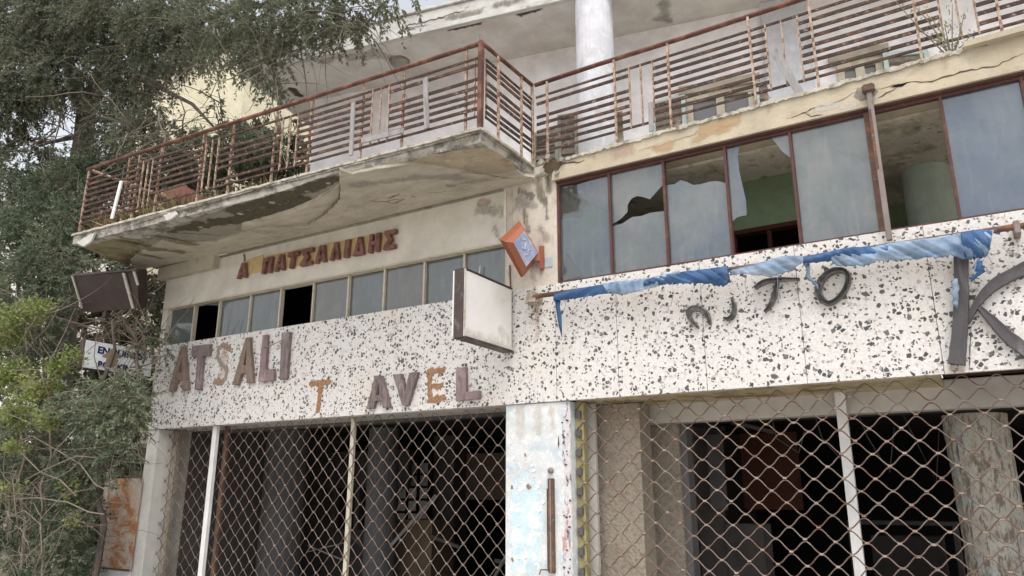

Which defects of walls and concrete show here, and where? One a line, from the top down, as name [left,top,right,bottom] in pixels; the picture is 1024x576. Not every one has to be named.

crack [794,53,1024,117]
spalling [77,172,340,264]
leakage [516,175,551,233]
peeling [508,464,545,575]
peeling [561,403,573,576]